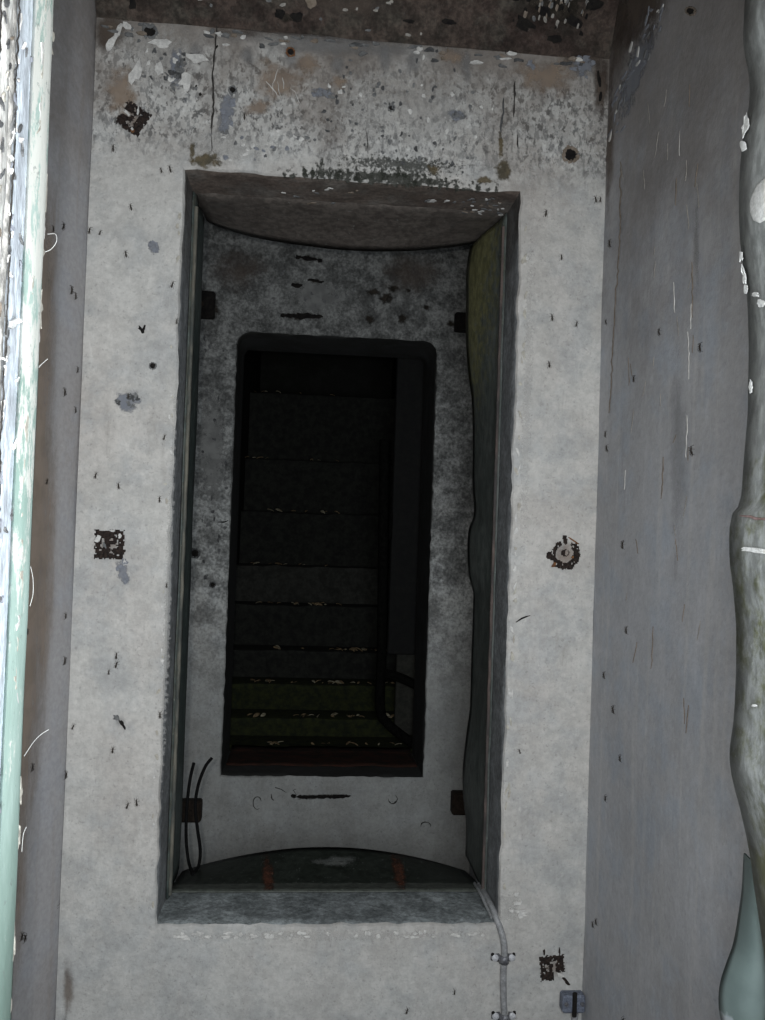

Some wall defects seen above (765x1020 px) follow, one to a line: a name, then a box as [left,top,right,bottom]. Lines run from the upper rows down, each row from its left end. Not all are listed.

spalling [266,0,393,22]
spalling [513,0,604,43]
peeling [106,22,209,108]
flaking render [248,47,317,126]
peeling [311,59,437,132]
peeling [219,85,316,162]
peeling [379,126,464,174]
peeling [740,112,750,152]
peeling [750,178,765,223]
peeling [739,251,765,307]
rust [546,535,581,570]